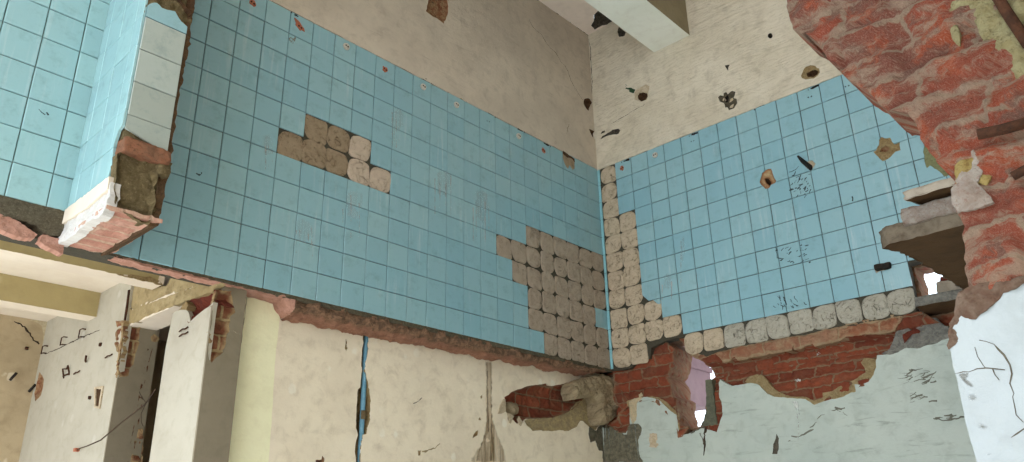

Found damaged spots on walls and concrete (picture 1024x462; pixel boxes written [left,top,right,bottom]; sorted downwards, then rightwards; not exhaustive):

flaking render [426,0,448,23]
spalling [992,0,1024,48]
spalling [168,0,195,154]
flaking render [801,65,820,79]
peeling [277,114,391,193]
spalling [874,137,900,161]
spalling [976,118,1024,140]
spalling [1010,165,1024,180]
peeling [101,145,995,462]
crack [955,340,1024,438]